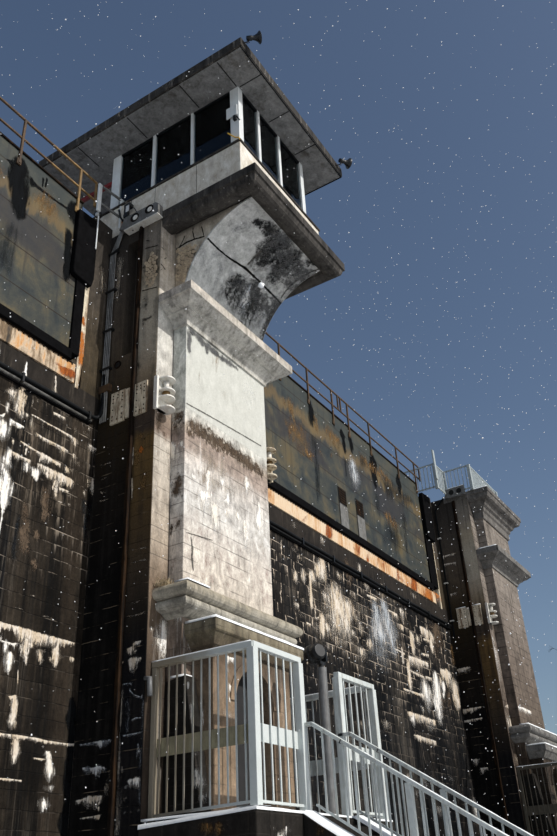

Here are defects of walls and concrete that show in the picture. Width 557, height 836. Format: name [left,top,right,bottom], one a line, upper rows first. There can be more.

crack [142,226,319,304]
damp [231,230,317,328]
corrosion [59,317,85,378]
damp [0,387,77,529]
damp [155,411,263,544]
damp [12,502,39,558]
damp [293,558,363,642]
corrosion [411,578,439,600]
damp [0,621,74,683]
damp [360,583,482,725]
damp [0,695,105,836]